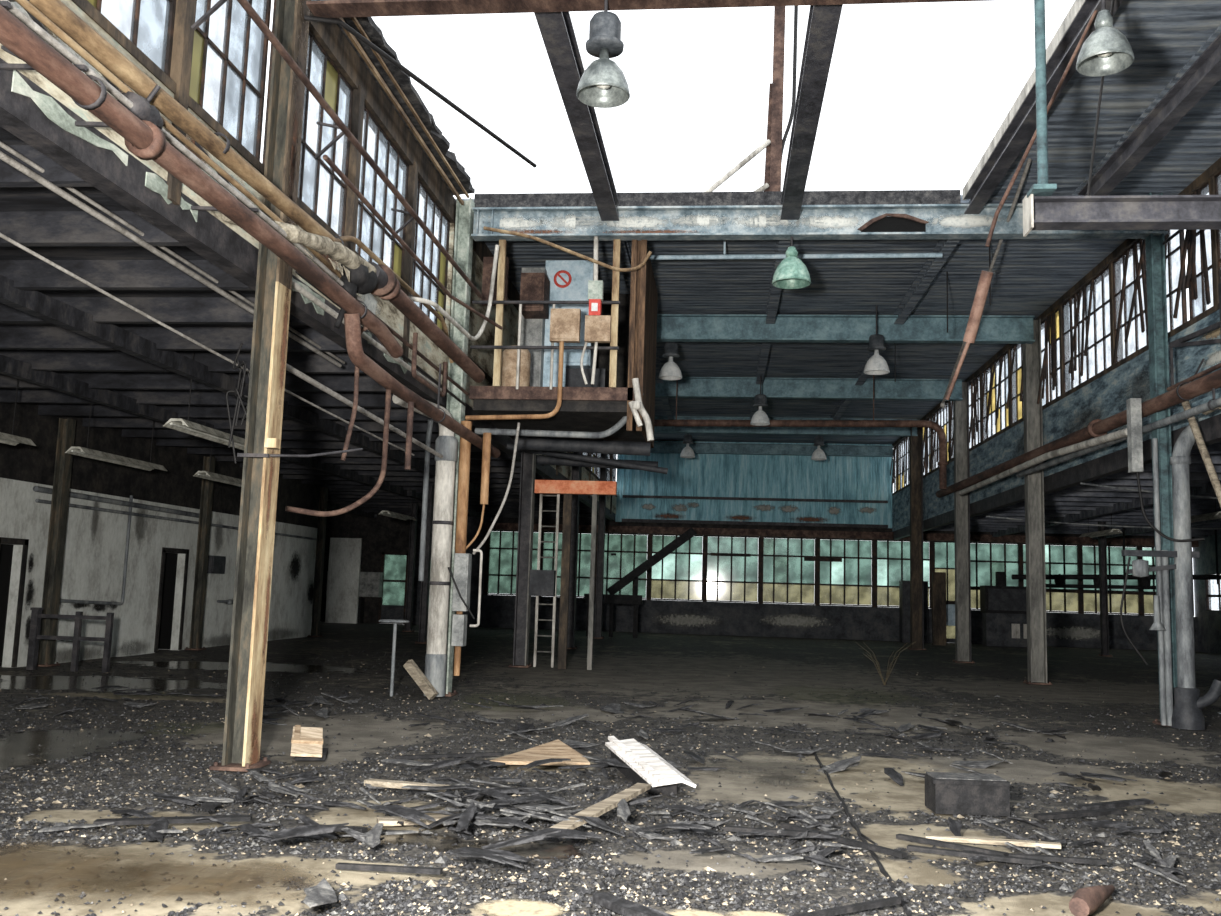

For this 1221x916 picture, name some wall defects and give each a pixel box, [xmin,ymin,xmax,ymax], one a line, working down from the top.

peeling [11,70,128,166]
corrosion [279,289,289,404]
peeling [362,293,379,314]
corrosion [263,572,271,662]